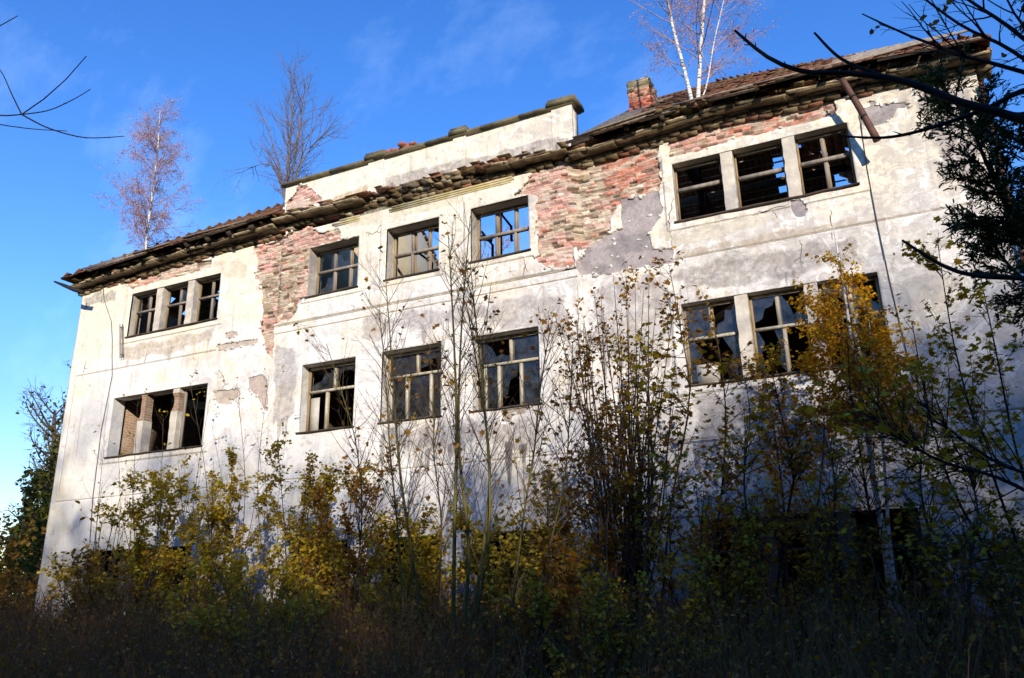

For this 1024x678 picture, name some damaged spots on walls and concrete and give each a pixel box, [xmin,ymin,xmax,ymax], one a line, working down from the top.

peeling [858,99,913,127]
flaking render [514,101,837,278]
flaking render [217,226,344,358]
peeling [213,374,268,413]